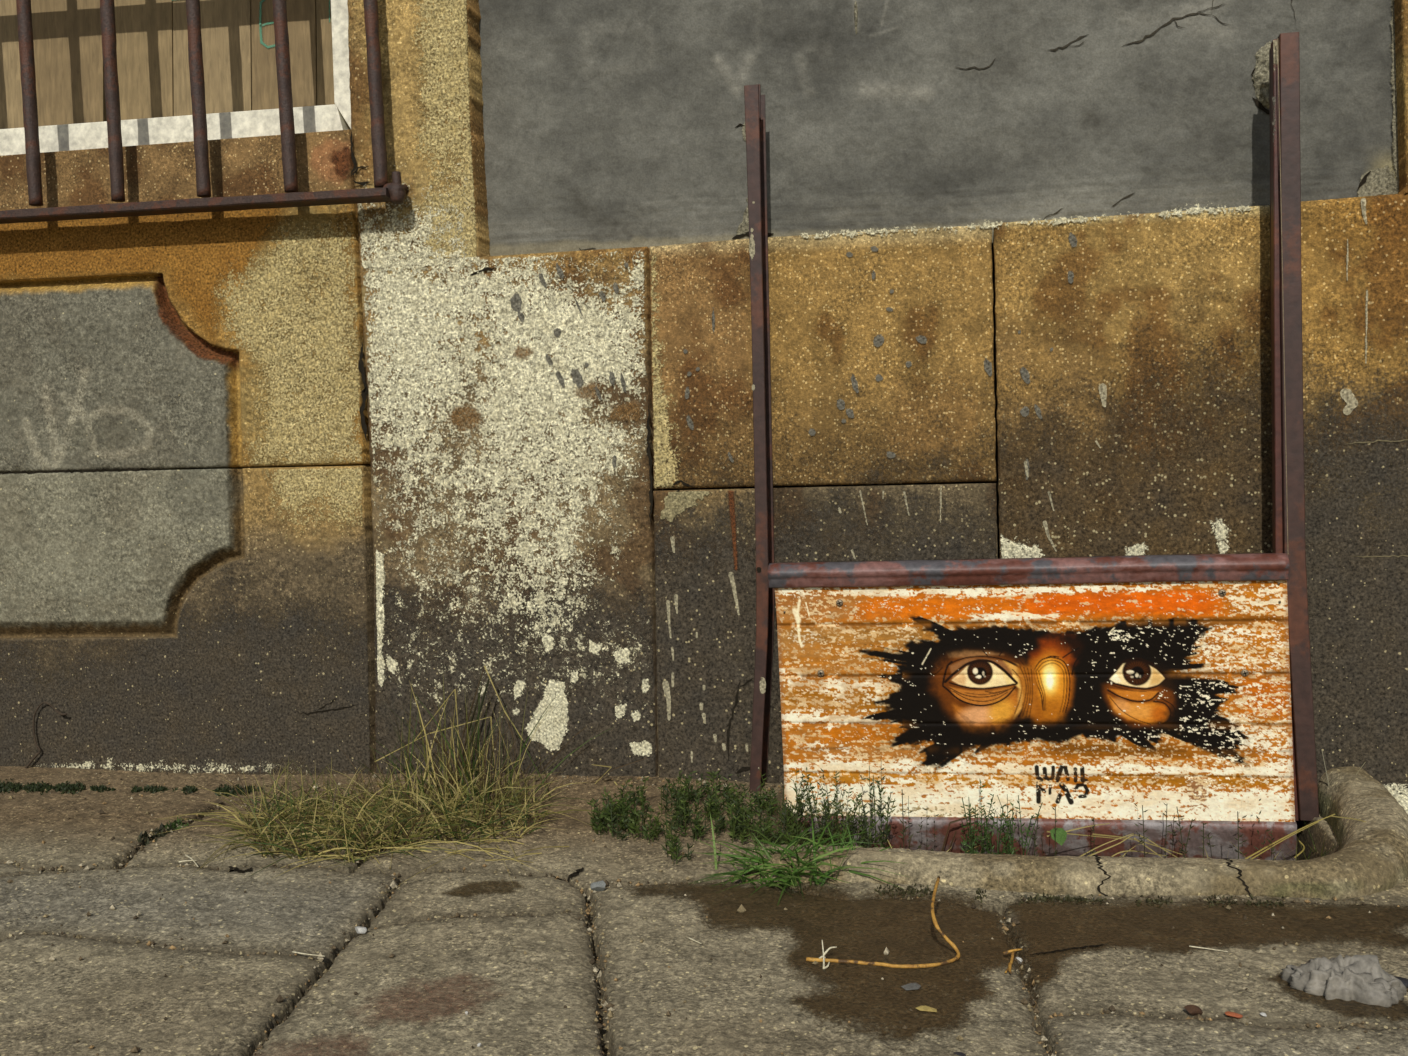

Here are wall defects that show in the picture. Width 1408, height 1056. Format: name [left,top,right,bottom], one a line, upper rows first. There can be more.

crack [1050,34,1089,51]
crack [1123,2,1230,46]
peeling [211,0,710,751]
water stain [774,310,1273,563]
water stain [0,442,784,784]
water stain [1304,368,1408,814]
peeling [629,740,652,757]